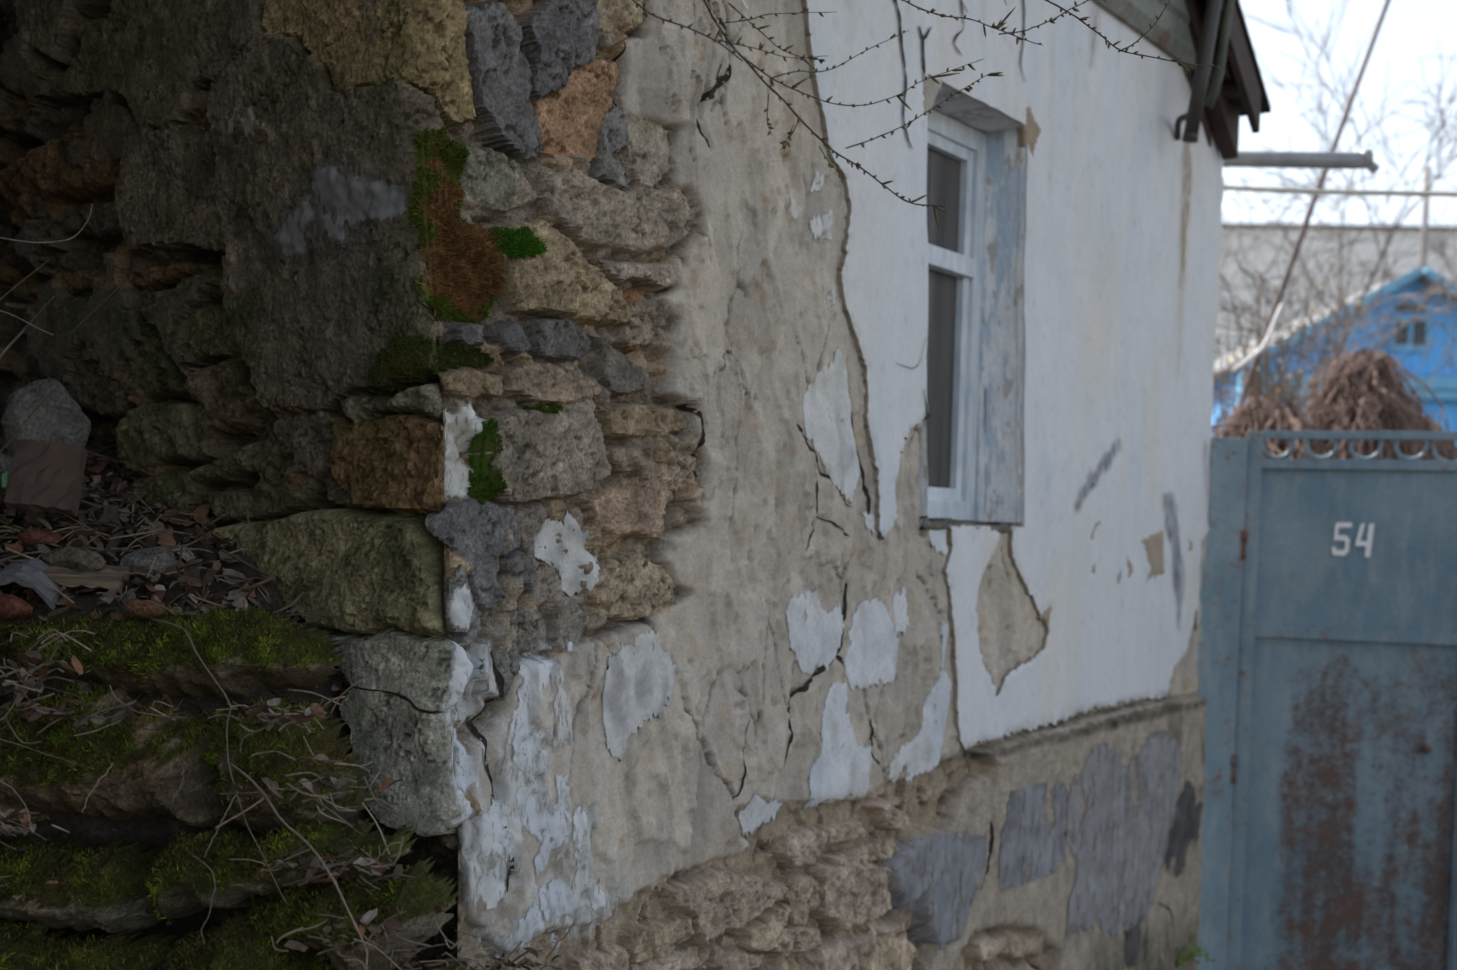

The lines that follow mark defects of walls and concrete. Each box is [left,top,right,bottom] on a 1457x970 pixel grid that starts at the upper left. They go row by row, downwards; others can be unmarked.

spalling [416,0,1206,970]